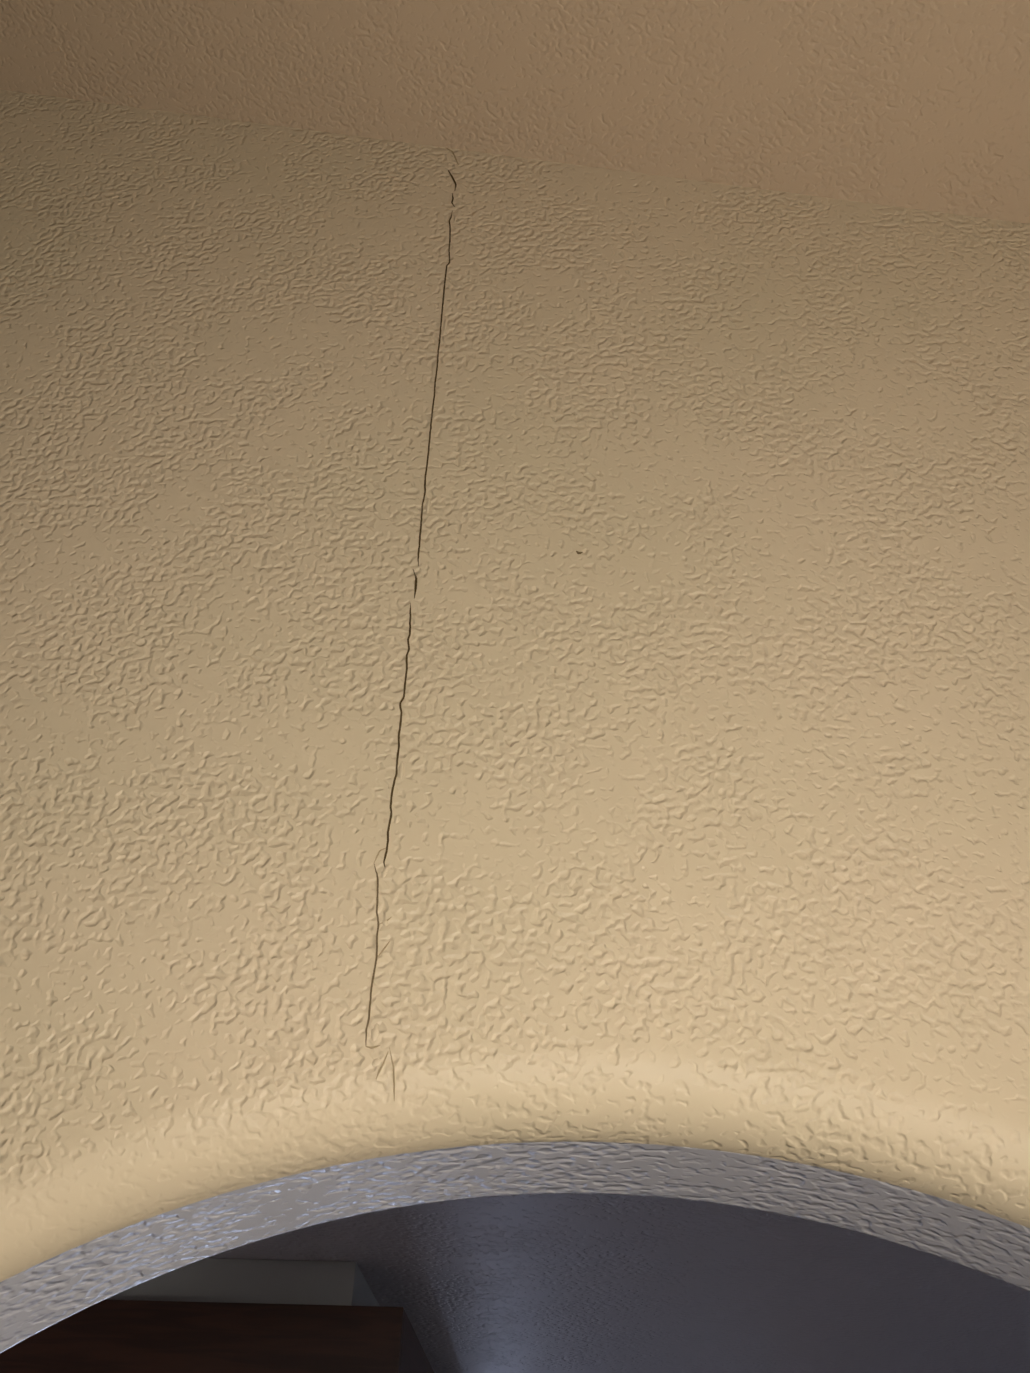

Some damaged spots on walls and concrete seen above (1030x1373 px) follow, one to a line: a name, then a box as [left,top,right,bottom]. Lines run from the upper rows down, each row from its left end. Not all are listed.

crack [365,148,460,1101]